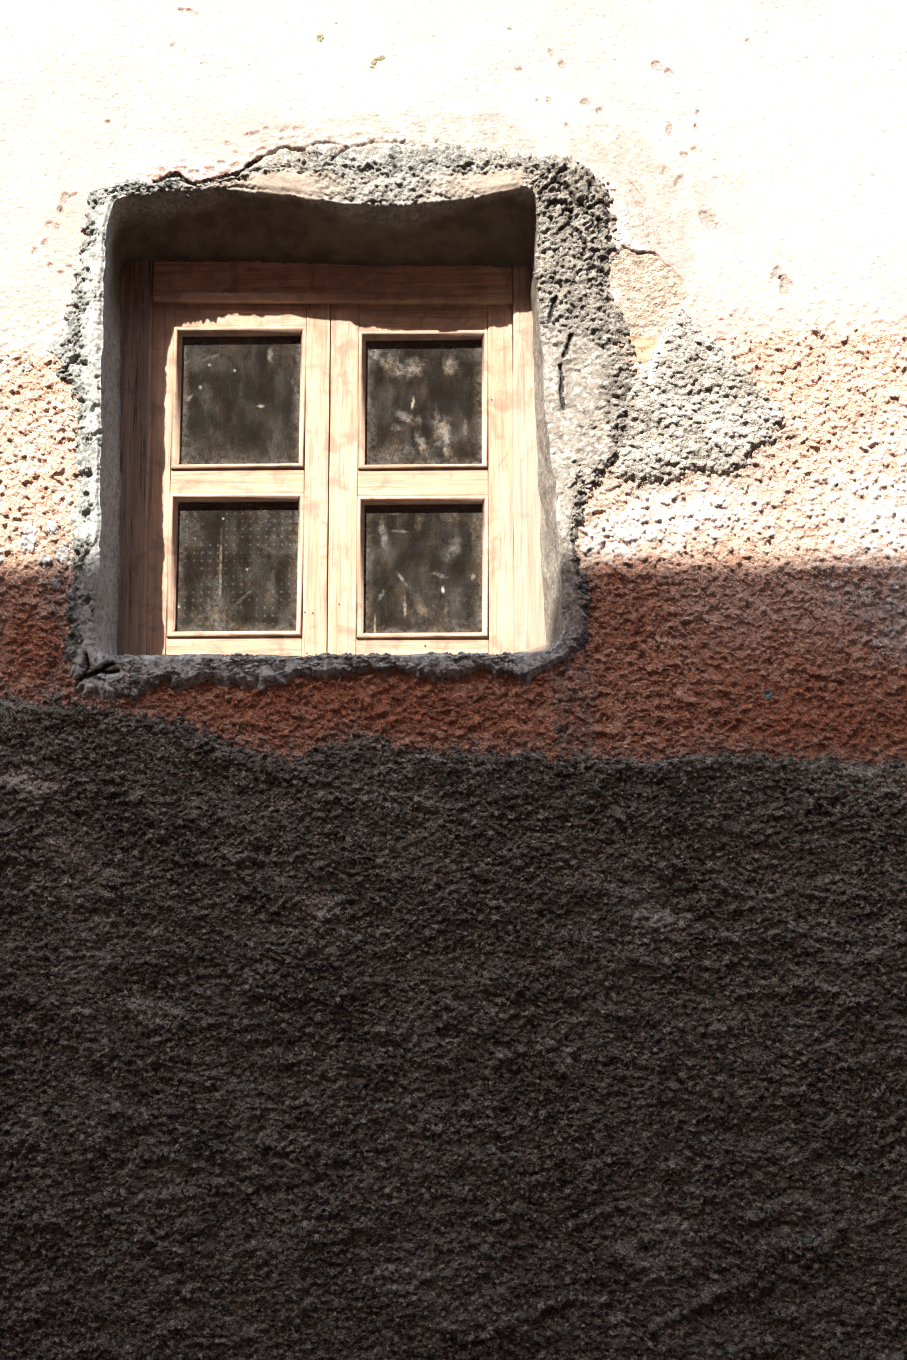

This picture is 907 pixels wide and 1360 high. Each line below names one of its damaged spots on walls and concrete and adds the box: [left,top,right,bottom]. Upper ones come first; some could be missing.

crack [297,142,389,161]
crack [153,154,265,199]
peeling [601,201,785,487]